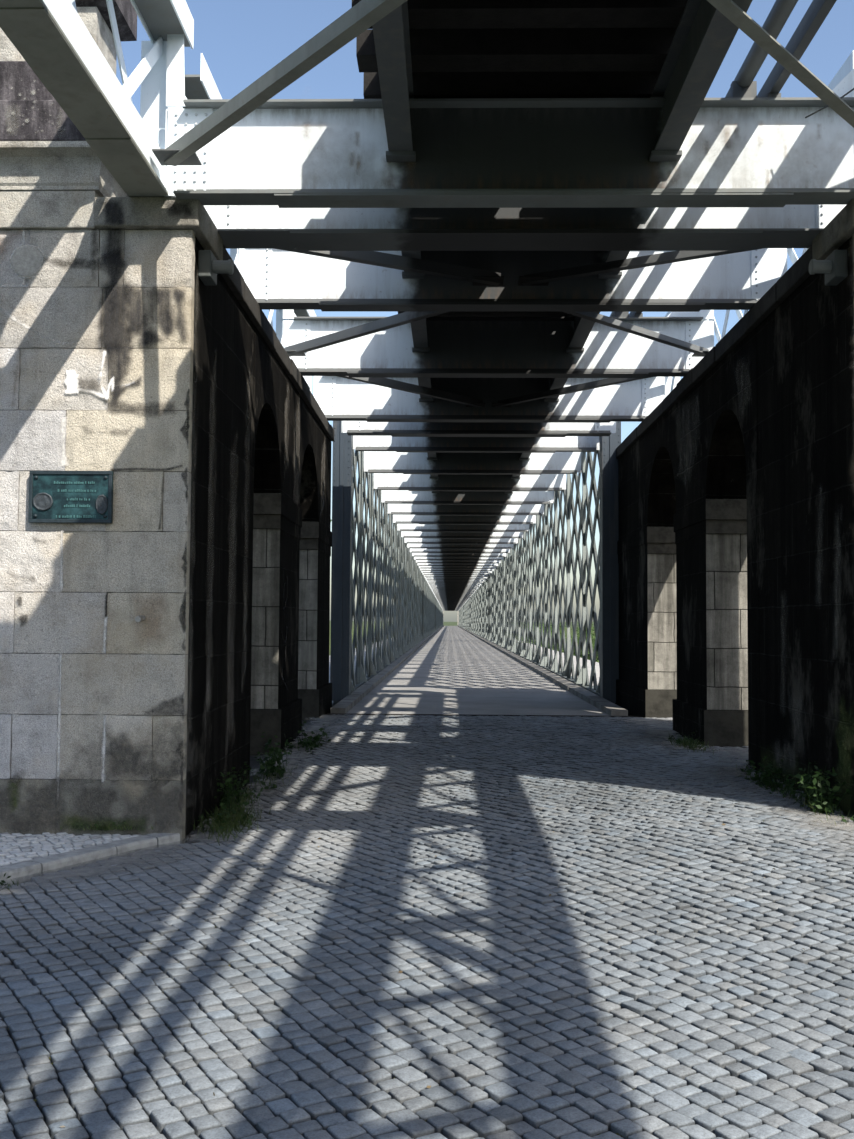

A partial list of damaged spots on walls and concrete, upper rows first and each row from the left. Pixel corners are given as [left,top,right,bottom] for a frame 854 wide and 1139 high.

leakage [53,202,197,414]